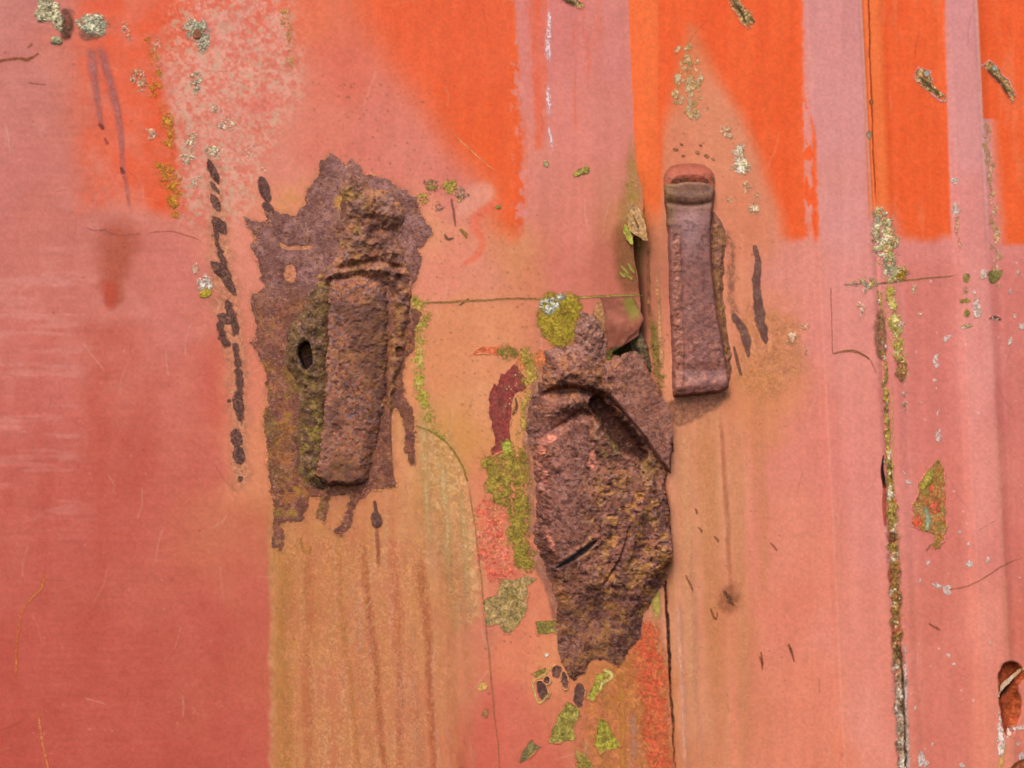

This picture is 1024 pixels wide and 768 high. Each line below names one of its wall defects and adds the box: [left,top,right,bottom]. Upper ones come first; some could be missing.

corrosion [243,153,433,558]
peeling [488,350,546,457]
corrosion [667,393,729,425]
corrosion [726,235,768,375]
peeling [903,459,970,565]
peeling [482,575,558,636]
corrosion [530,548,557,631]
peeling [918,742,933,767]
spalling [997,662,1024,768]